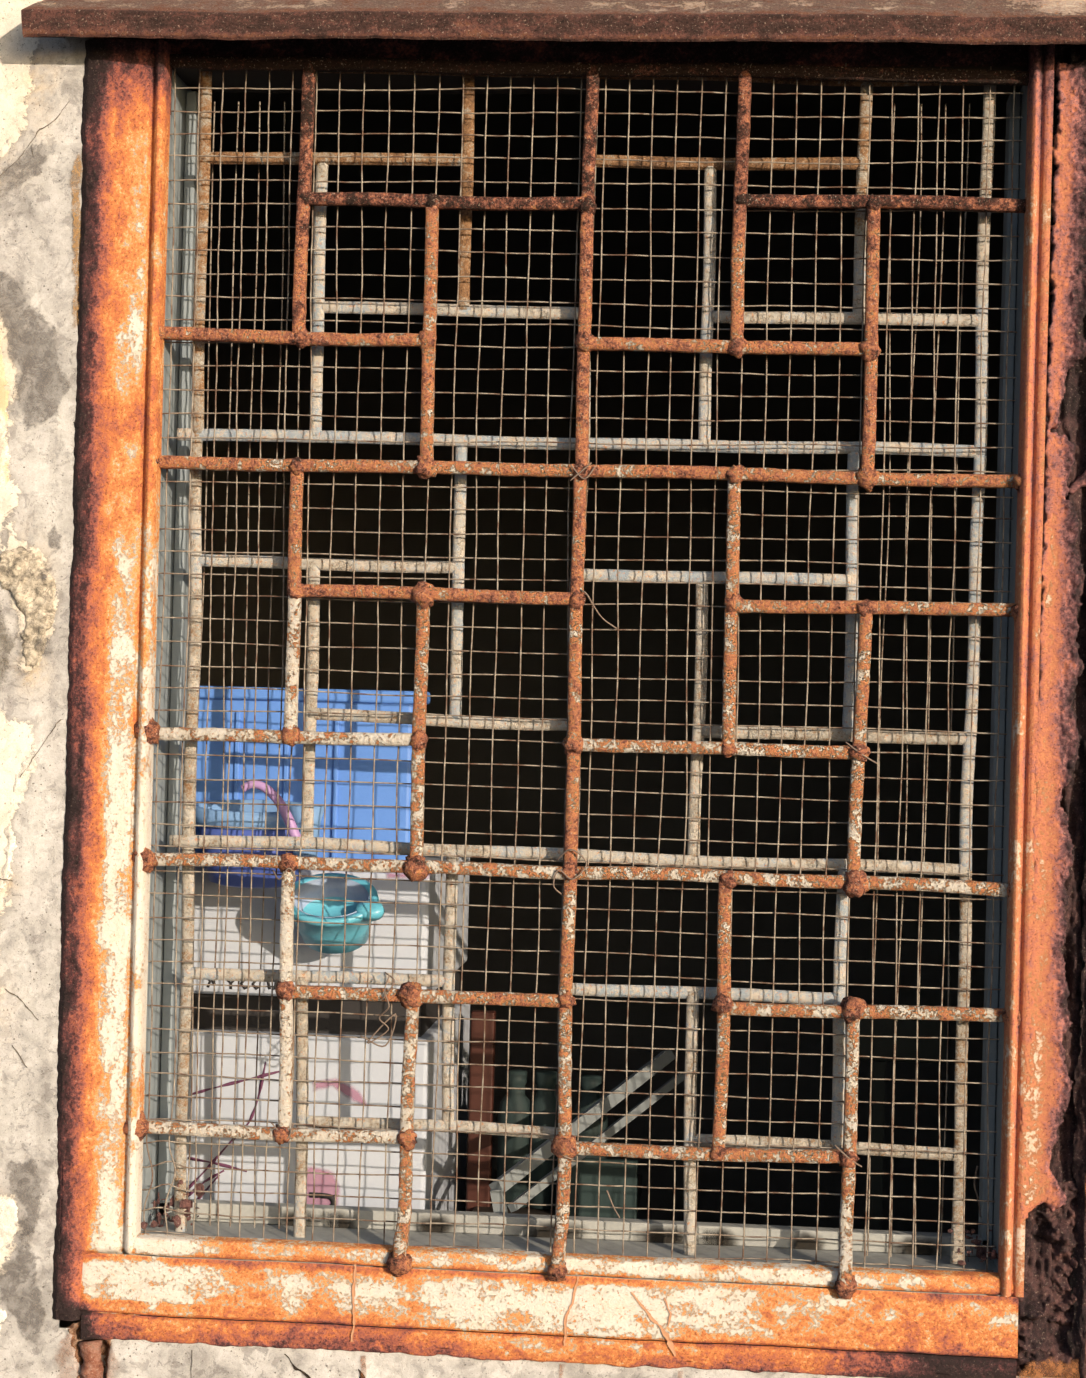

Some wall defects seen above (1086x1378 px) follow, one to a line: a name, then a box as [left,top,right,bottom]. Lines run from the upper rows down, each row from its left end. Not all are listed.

water stain [0,147,46,186]
corrosion [72,157,82,322]
corrosion [1046,45,1086,382]
peeling [0,338,11,489]
water stain [0,272,69,426]
spalling [0,546,57,668]
corrosion [1045,358,1086,1185]
corrosion [563,1276,579,1346]
corrosion [631,1292,676,1357]
corrosion [1016,1212,1080,1378]